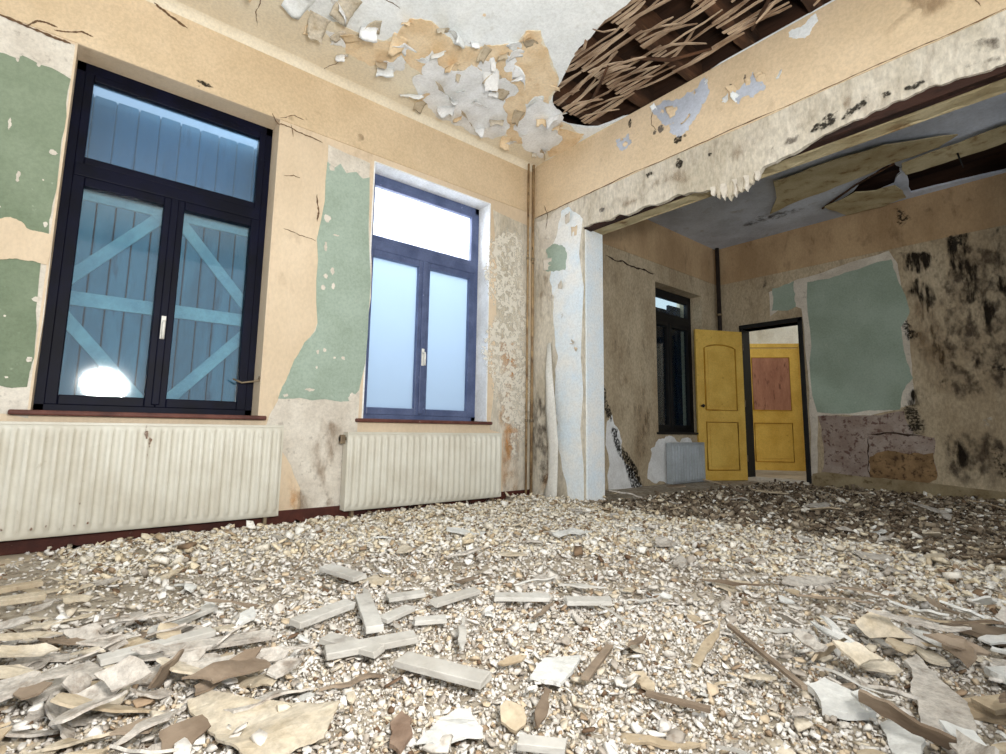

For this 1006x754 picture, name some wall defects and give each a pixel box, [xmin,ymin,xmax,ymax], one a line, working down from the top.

crack [0,14,93,44]
crack [155,3,187,28]
peeling [788,14,818,39]
peeling [177,0,639,205]
peeling [649,77,710,138]
peeling [722,69,782,104]
damp [906,252,936,312]
damp [931,233,1006,394]
spalling [604,388,692,490]
damp [818,390,938,483]
damp [950,436,1006,479]